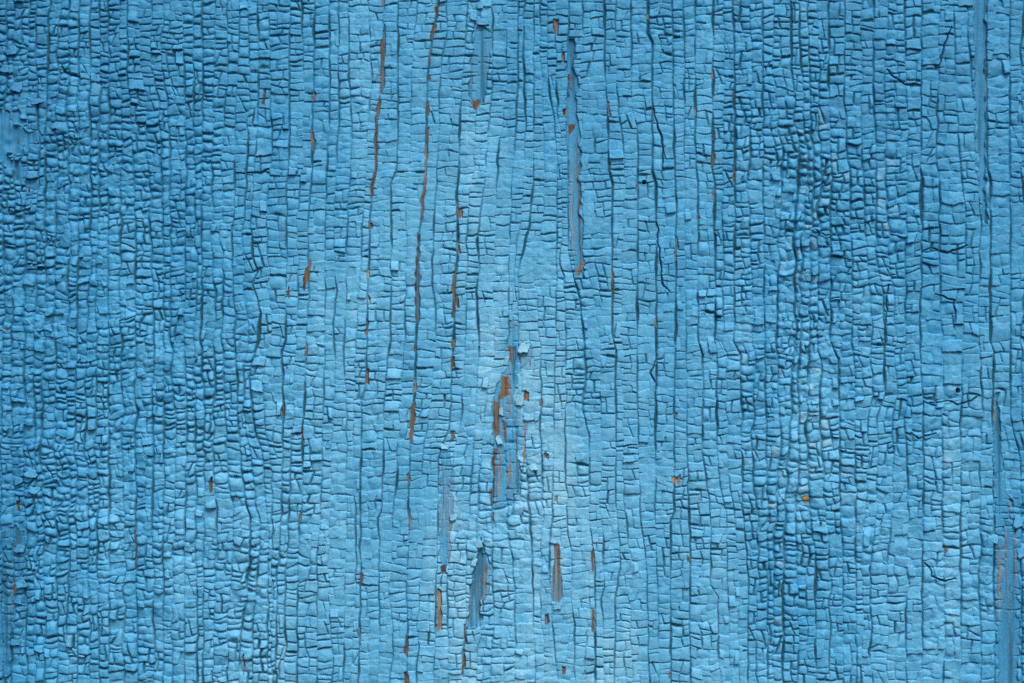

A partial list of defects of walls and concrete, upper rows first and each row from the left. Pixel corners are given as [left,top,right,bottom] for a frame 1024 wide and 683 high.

crack [61,0,87,92]
crack [71,252,87,402]
crack [127,402,146,569]
crack [231,0,333,682]
crack [357,0,541,683]
peeling [489,320,549,523]
crack [560,0,753,683]
crack [780,0,1004,522]
peeling [467,539,494,629]
peeling [545,537,563,625]
crack [779,578,787,682]
crack [813,549,826,656]